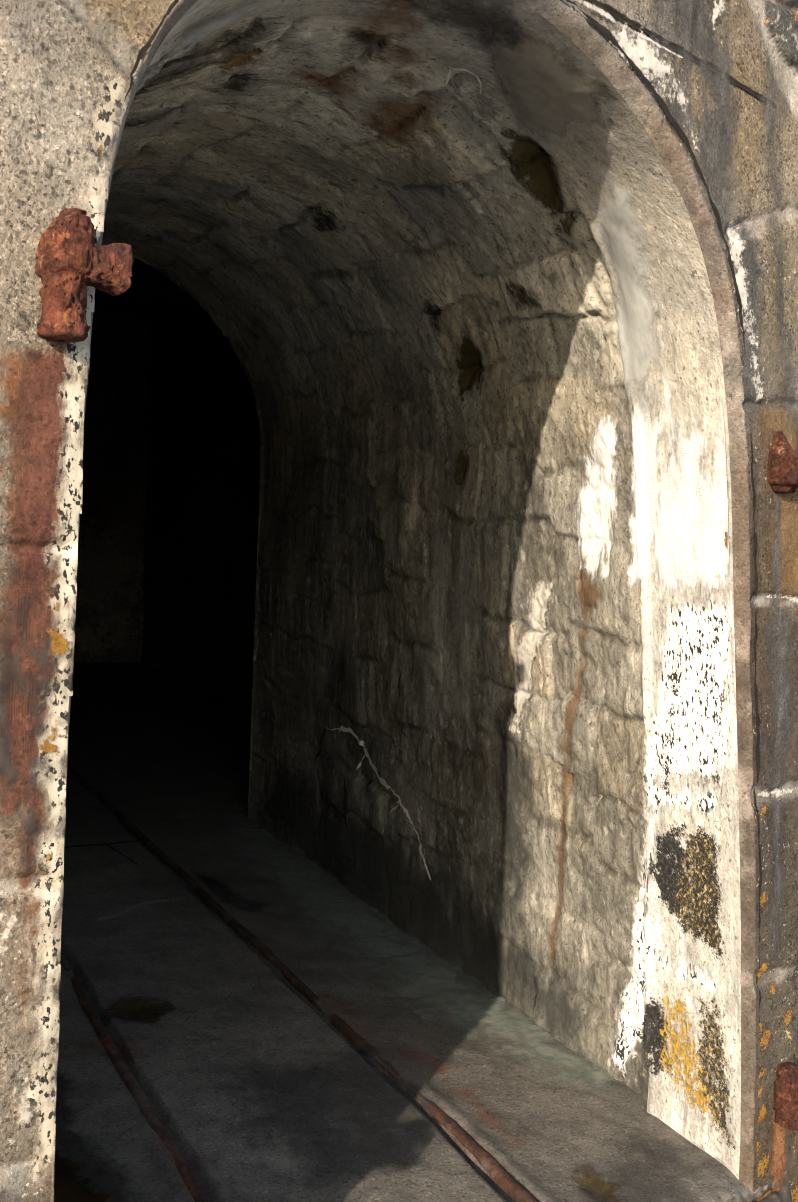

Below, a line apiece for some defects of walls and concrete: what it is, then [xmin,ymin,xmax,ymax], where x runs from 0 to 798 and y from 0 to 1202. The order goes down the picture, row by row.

crack [125,0,179,99]
spalling [500,129,577,234]
water stain [580,0,738,207]
crack [566,0,777,349]
water stain [726,221,763,415]
water stain [770,218,798,454]
rust [0,346,78,911]
water stain [758,496,798,952]
rust [773,487,798,592]